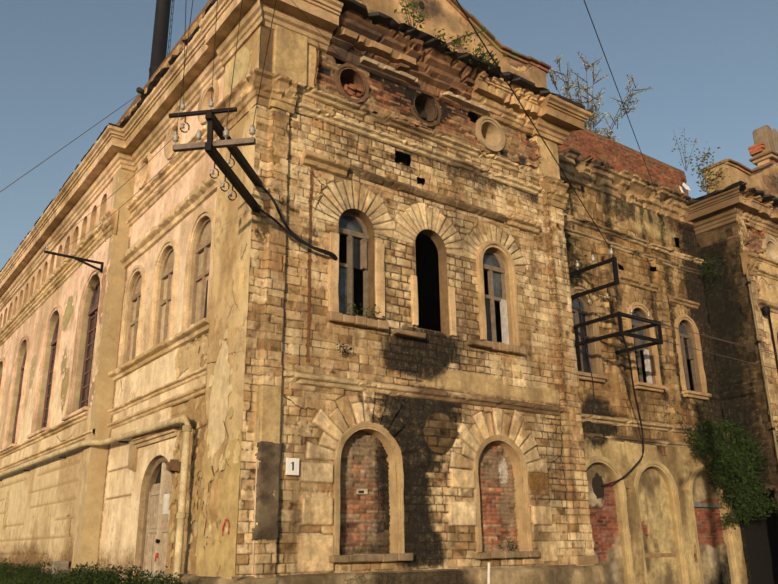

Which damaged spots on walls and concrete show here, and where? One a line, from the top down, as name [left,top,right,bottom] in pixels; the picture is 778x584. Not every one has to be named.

flaking render [314,41,541,171]
flaking render [60,348,70,412]
flaking render [62,295,73,332]
corrosion [306,167,314,362]
damp [381,327,461,390]
flaking render [167,328,242,579]
damp [359,393,468,584]